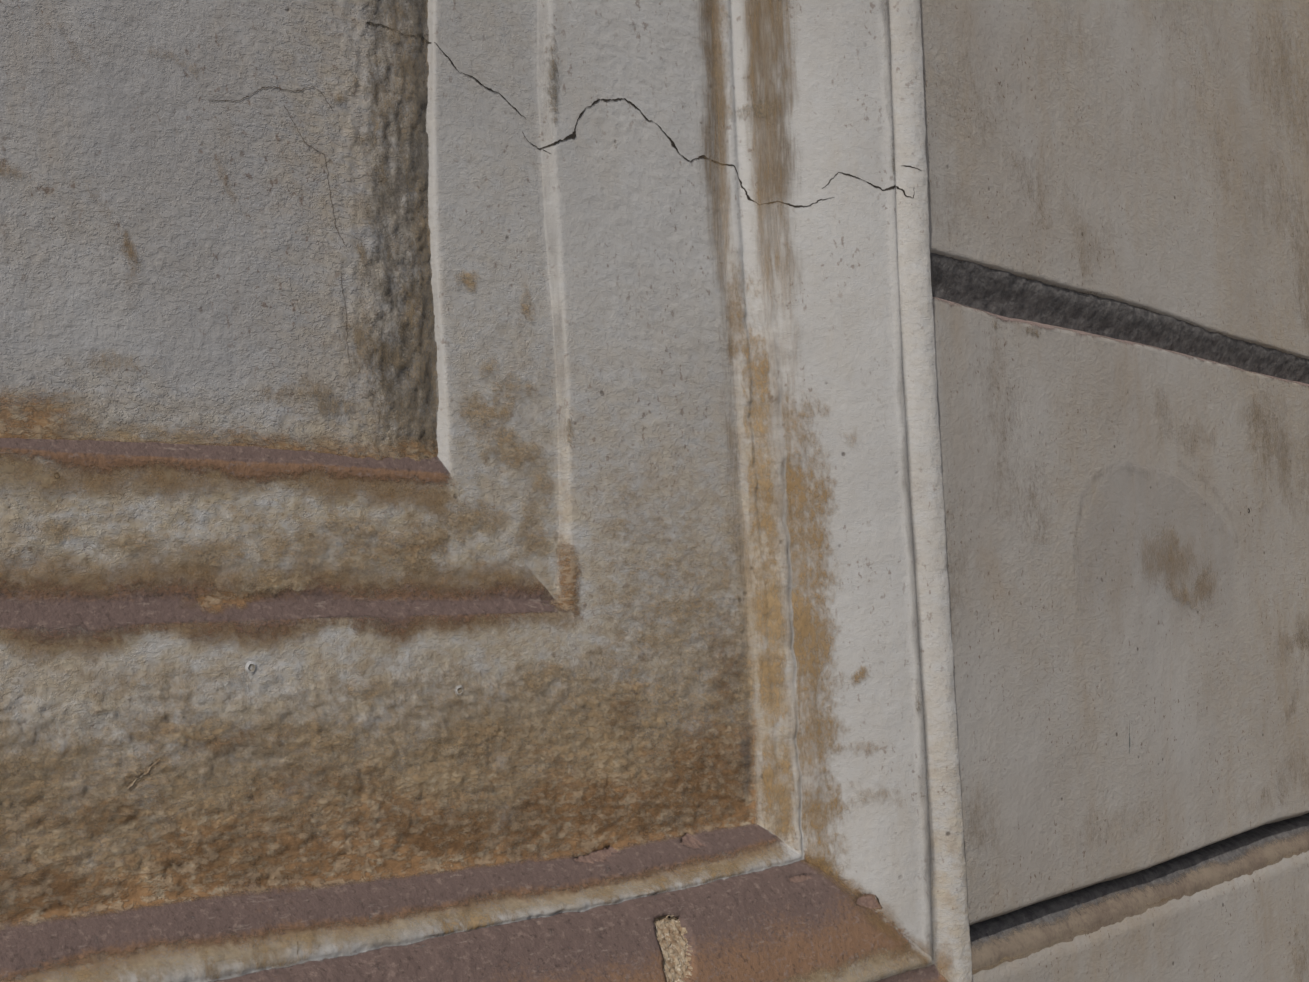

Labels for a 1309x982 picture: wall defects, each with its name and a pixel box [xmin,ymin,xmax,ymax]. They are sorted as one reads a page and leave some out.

crack [209,86,344,243]
water stain [549,47,559,120]
crack [366,22,922,207]
water stain [701,0,727,246]
water stain [743,0,786,222]
water stain [0,545,580,643]
water stain [786,458,861,899]
water stain [0,842,781,982]
spalling [654,915,693,982]